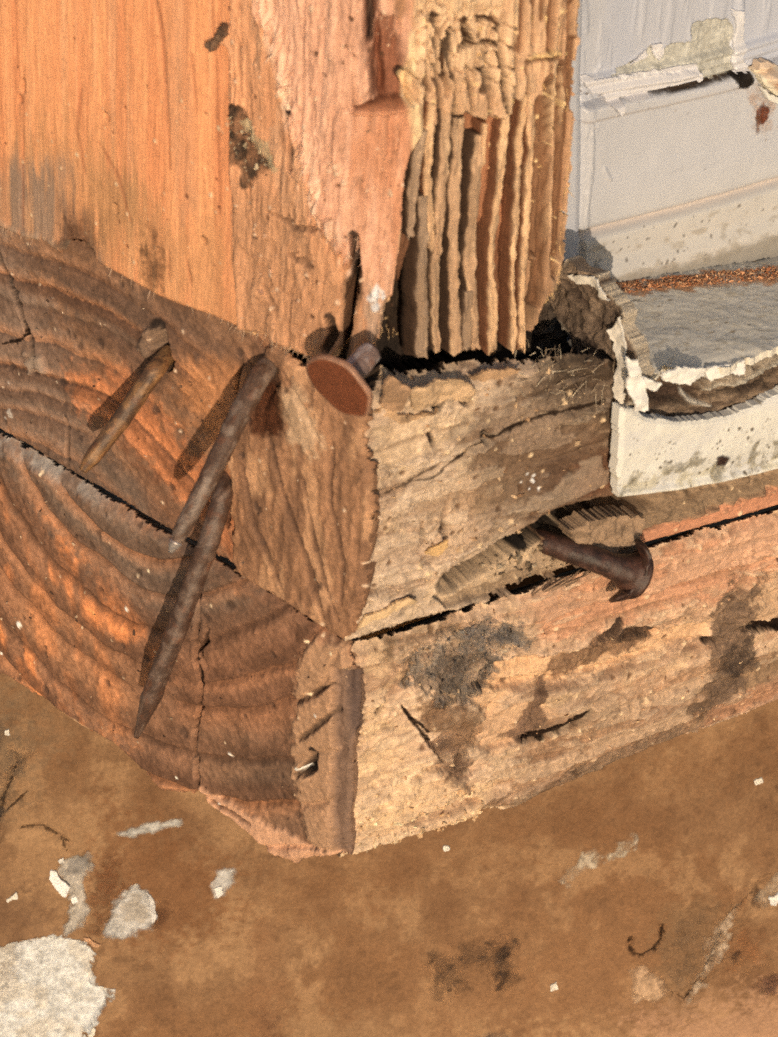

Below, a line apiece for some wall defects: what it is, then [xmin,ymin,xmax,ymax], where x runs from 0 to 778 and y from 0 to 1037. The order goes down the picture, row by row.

peeling [580,8,778,117]
peeling [568,274,610,301]
rust [251,382,282,435]
peeling [606,317,746,412]
damp [399,618,532,793]
crack [521,711,589,742]